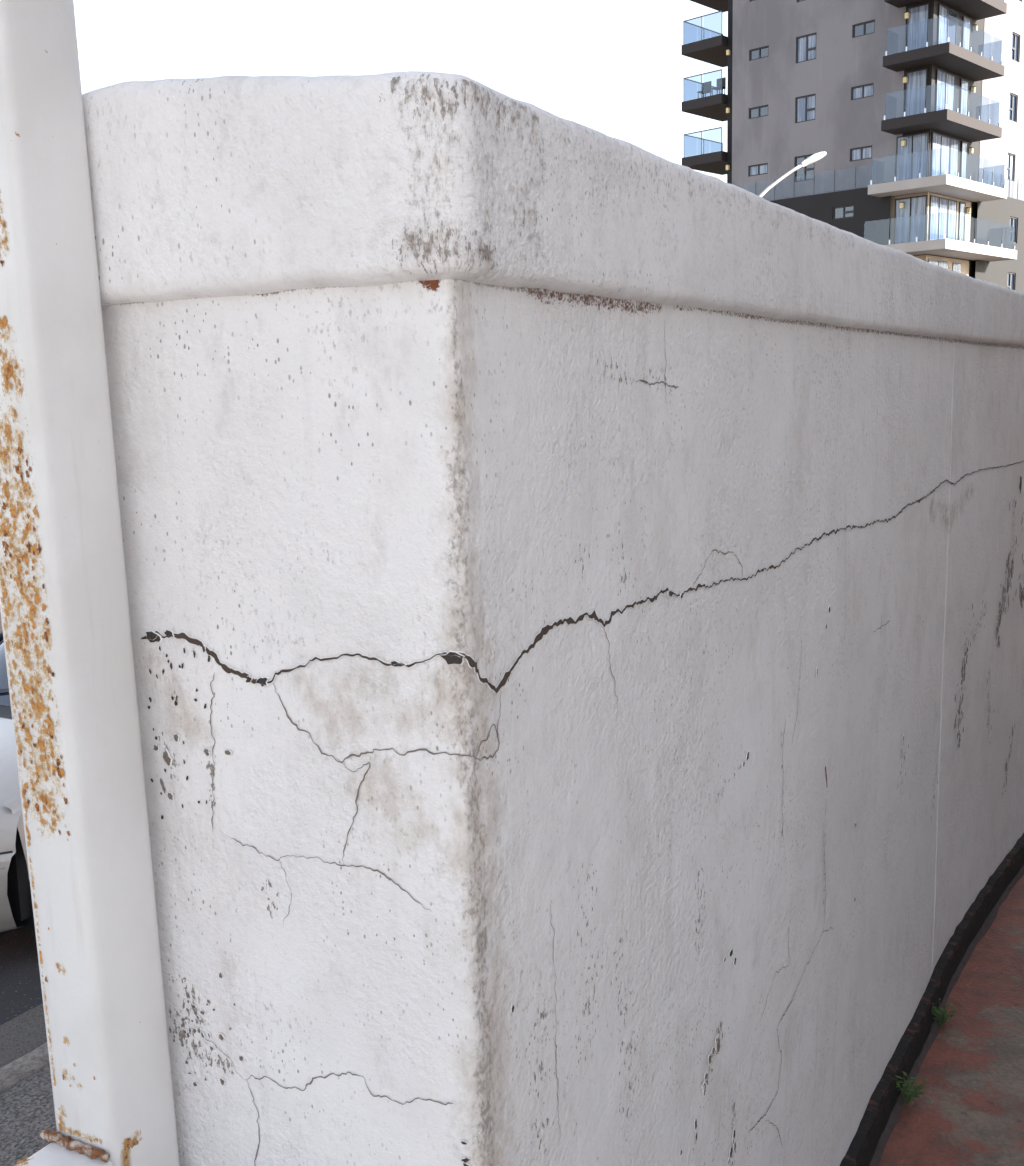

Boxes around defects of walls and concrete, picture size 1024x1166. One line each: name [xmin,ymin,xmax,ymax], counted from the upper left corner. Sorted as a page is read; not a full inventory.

leakage [380,74,537,139]
leakage [386,155,504,285]
rust [0,315,70,1048]
crack [141,460,1024,921]
rust [58,1106,102,1143]
rust [123,1132,142,1166]